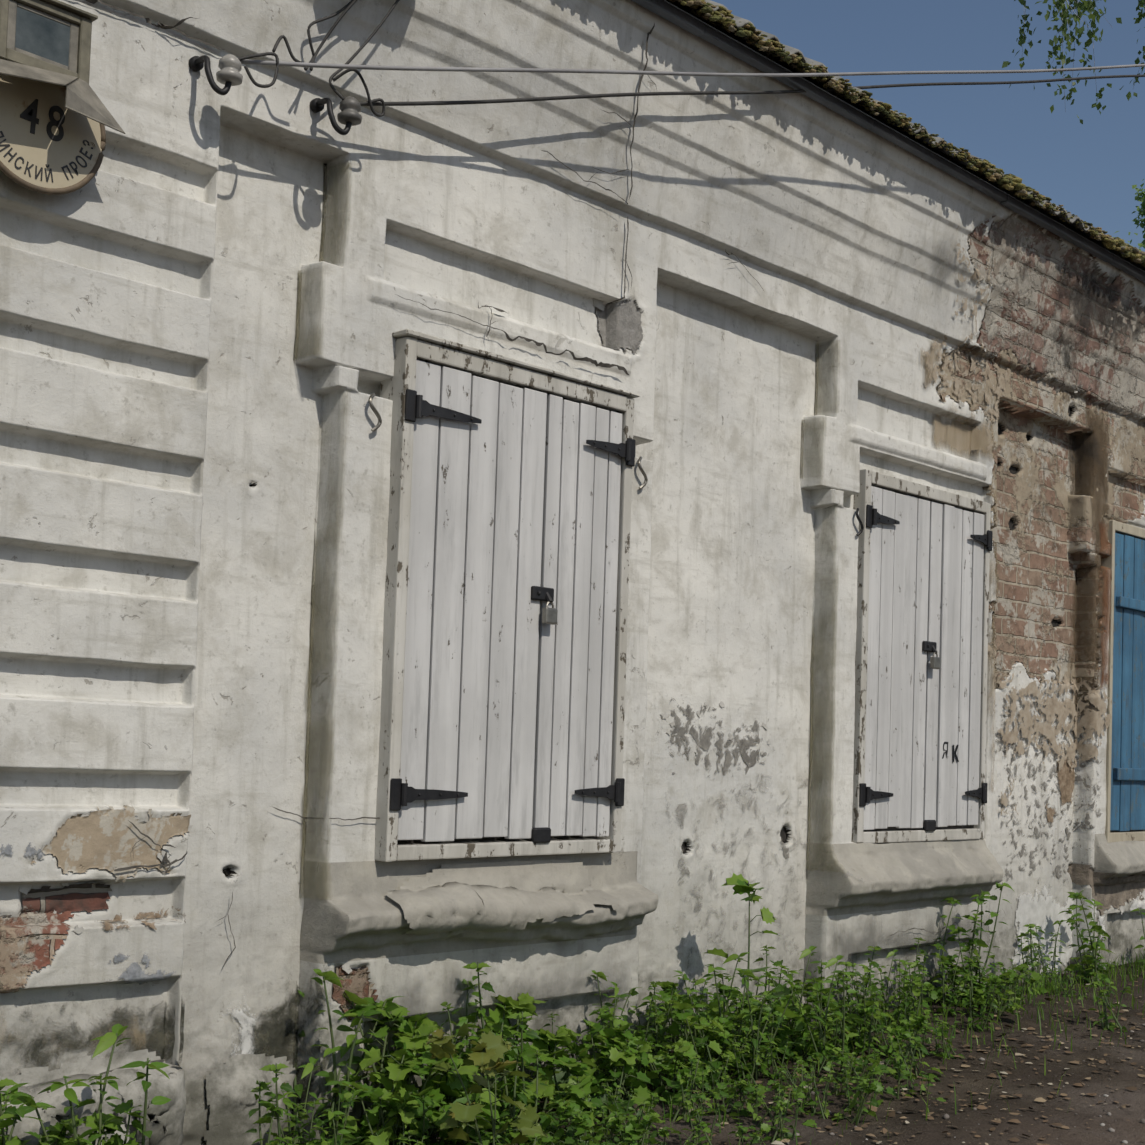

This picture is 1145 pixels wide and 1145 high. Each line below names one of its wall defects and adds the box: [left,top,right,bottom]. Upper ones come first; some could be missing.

crack [86,0,225,50]
crack [541,23,657,305]
crack [395,294,629,375]
flaking render [593,298,643,354]
flaking render [917,212,1145,975]
peeling [660,698,771,809]
peeling [0,805,194,993]